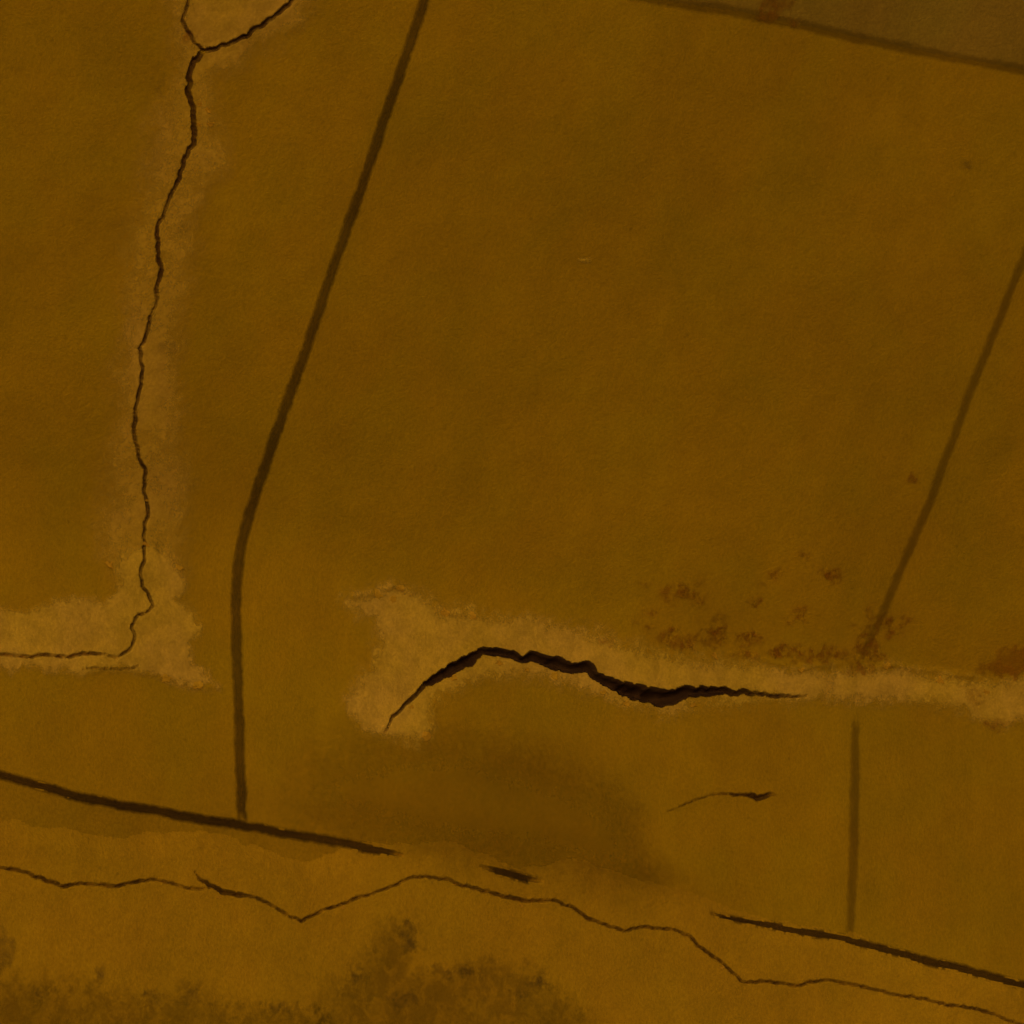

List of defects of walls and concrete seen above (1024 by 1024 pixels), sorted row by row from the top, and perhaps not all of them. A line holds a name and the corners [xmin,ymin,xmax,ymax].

crack [0,1,291,658]
crack [387,647,798,728]
crack [730,793,770,801]
crack [7,868,144,888]
crack [171,881,278,908]
crack [692,938,780,984]